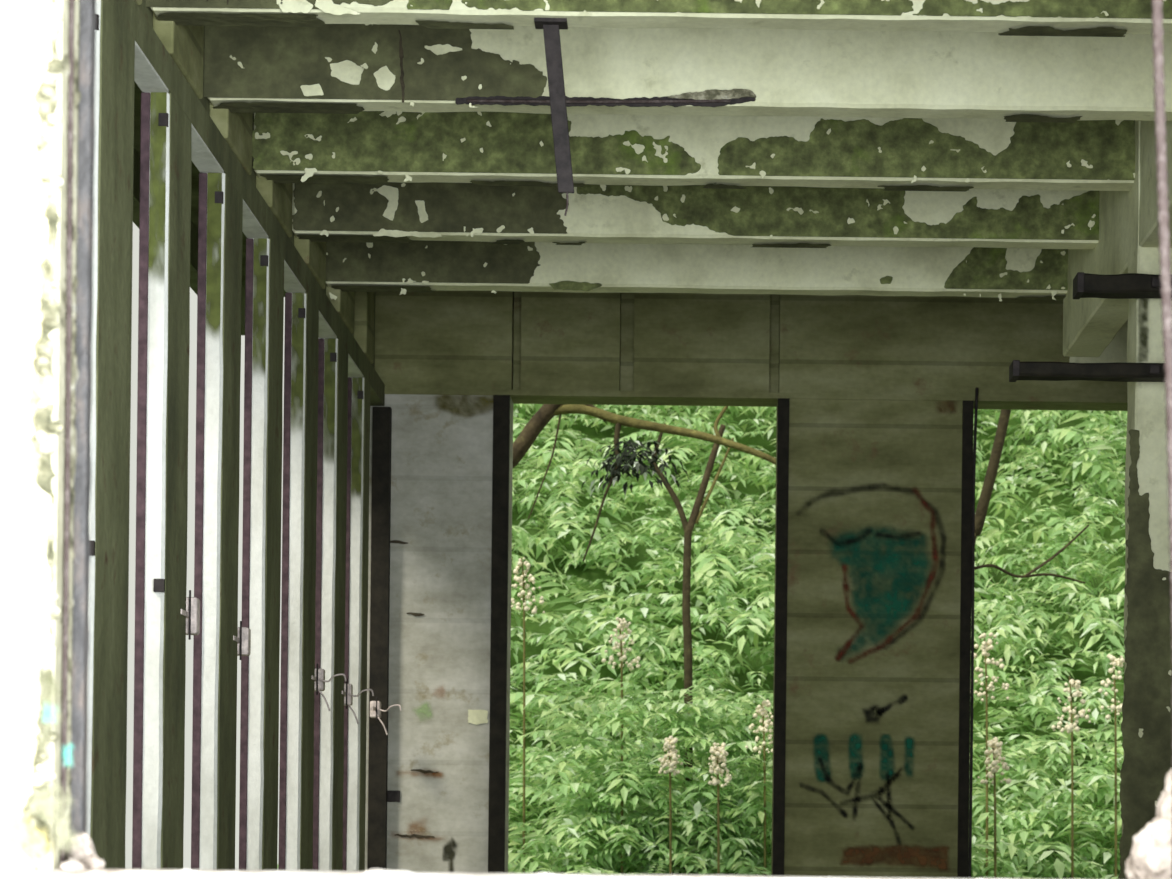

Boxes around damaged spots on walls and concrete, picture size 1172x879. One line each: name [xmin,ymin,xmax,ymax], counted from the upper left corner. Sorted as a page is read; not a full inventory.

damp [0,784,75,859]
spalling [23,0,81,870]
damp [90,0,135,869]
peeling [146,0,586,300]
peeling [407,0,1172,879]